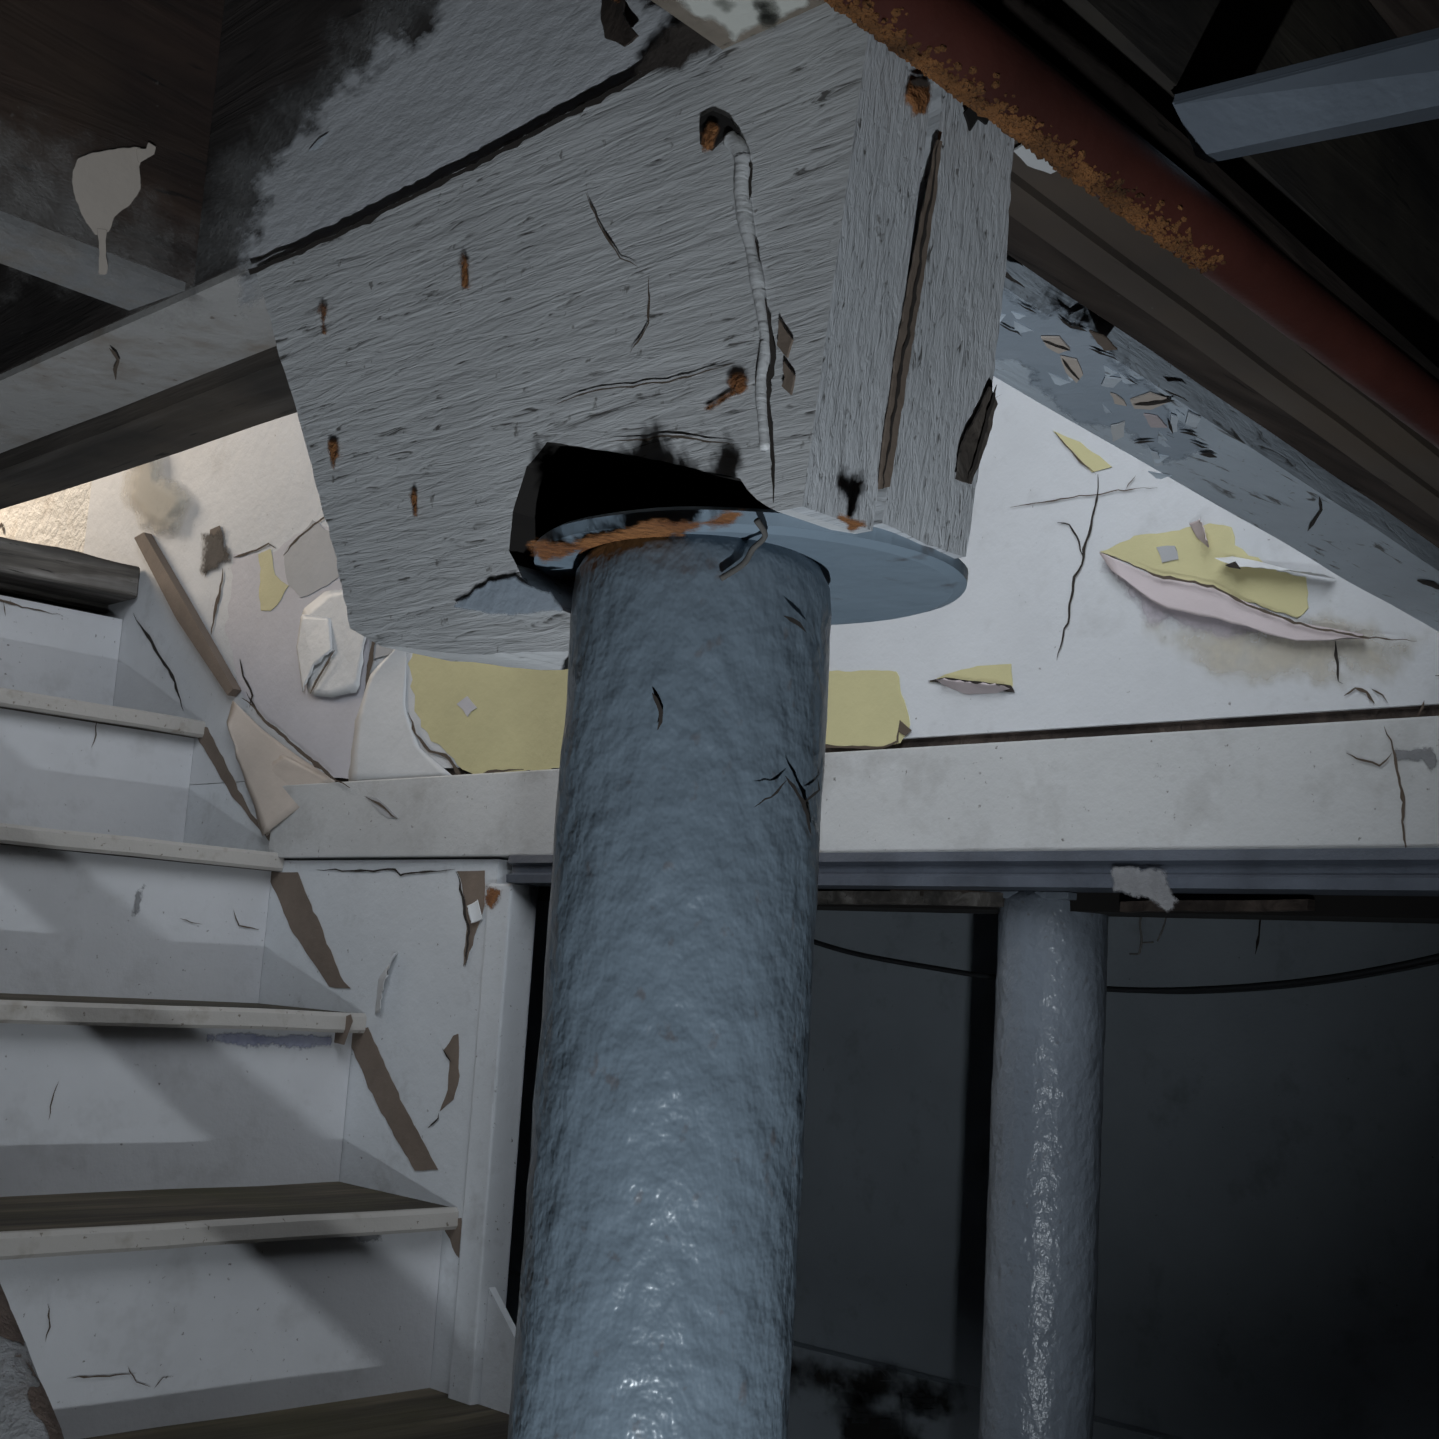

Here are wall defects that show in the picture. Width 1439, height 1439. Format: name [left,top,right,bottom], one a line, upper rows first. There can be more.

rust [824,0,1226,274]
crack [878,140,943,489]
peeling [995,289,1217,479]
crack [1014,477,1151,657]
peeling [1099,519,1411,641]
crack [1308,497,1323,531]
peeling [200,520,568,836]
peeling [825,670,912,749]
peeling [930,664,1015,694]
crack [1334,641,1439,848]
peeling [456,870,485,966]
mould [790,1360,951,1439]